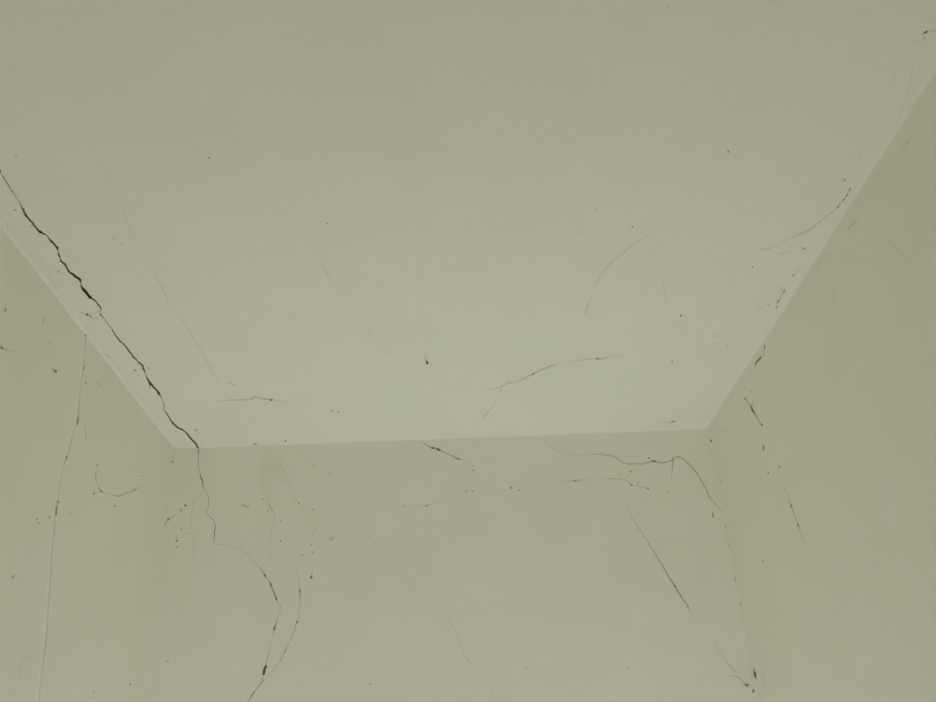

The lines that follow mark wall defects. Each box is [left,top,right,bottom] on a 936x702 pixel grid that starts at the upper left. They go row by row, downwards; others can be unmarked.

crack [0,163,320,702]
crack [543,438,721,616]
crack [715,643,755,693]